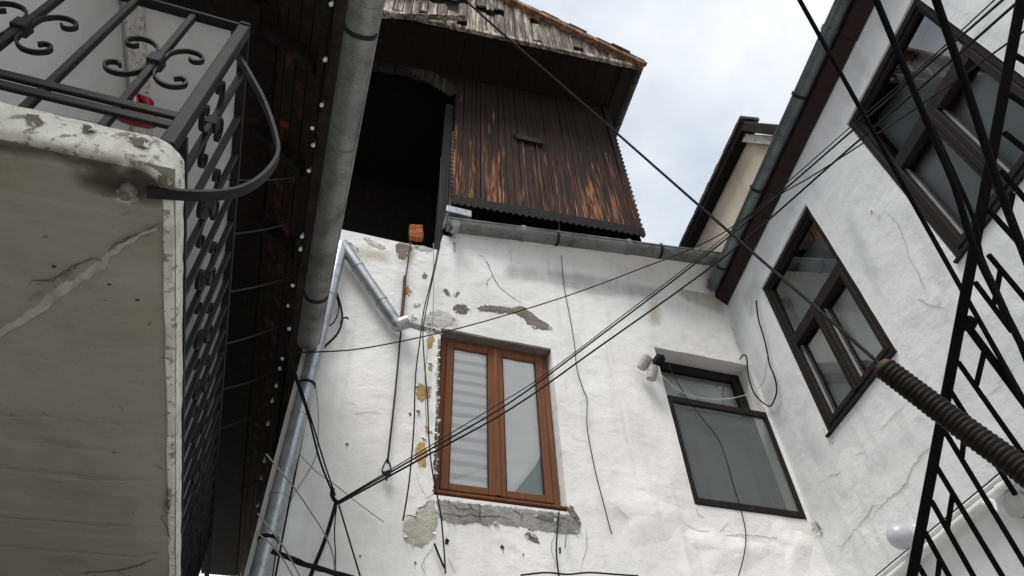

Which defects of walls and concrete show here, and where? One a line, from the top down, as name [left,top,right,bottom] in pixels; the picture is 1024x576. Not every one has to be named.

peeling [23,108,47,126]
peeling [82,122,98,132]
peeling [128,132,152,148]
crack [29,216,170,285]
spalling [348,237,433,259]
spalling [405,285,581,543]